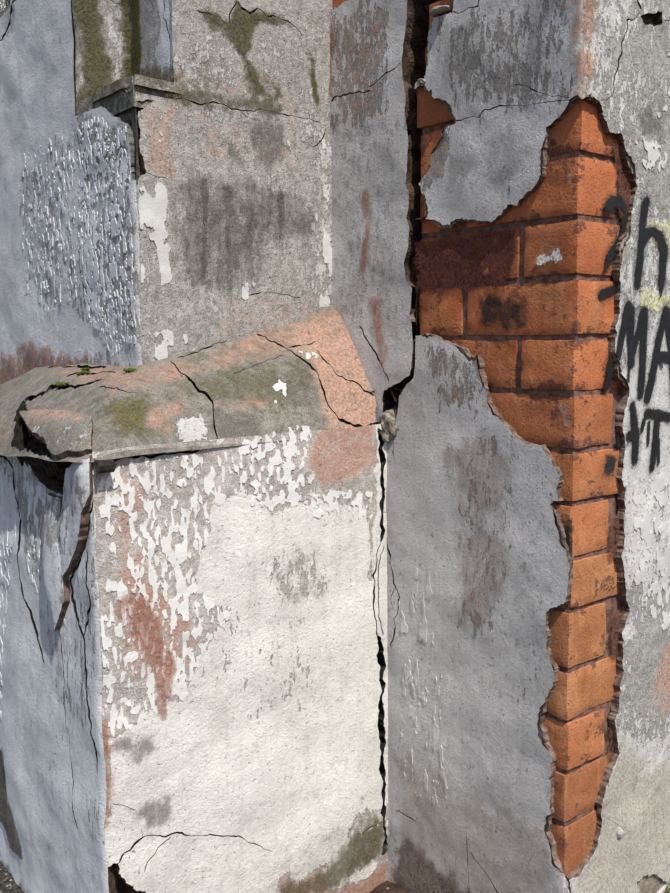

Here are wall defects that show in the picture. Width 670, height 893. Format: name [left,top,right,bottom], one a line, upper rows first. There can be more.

water stain [121,0,282,116]
crack [605,0,641,101]
peeling [22,99,172,357]
crack [94,340,227,474]
peeling [149,329,195,360]
crack [233,0,479,855]
flaking render [409,82,670,881]
crack [0,364,136,829]
peeling [97,425,373,737]
crack [112,803,273,872]
water stain [280,818,386,893]
water stain [393,839,470,893]